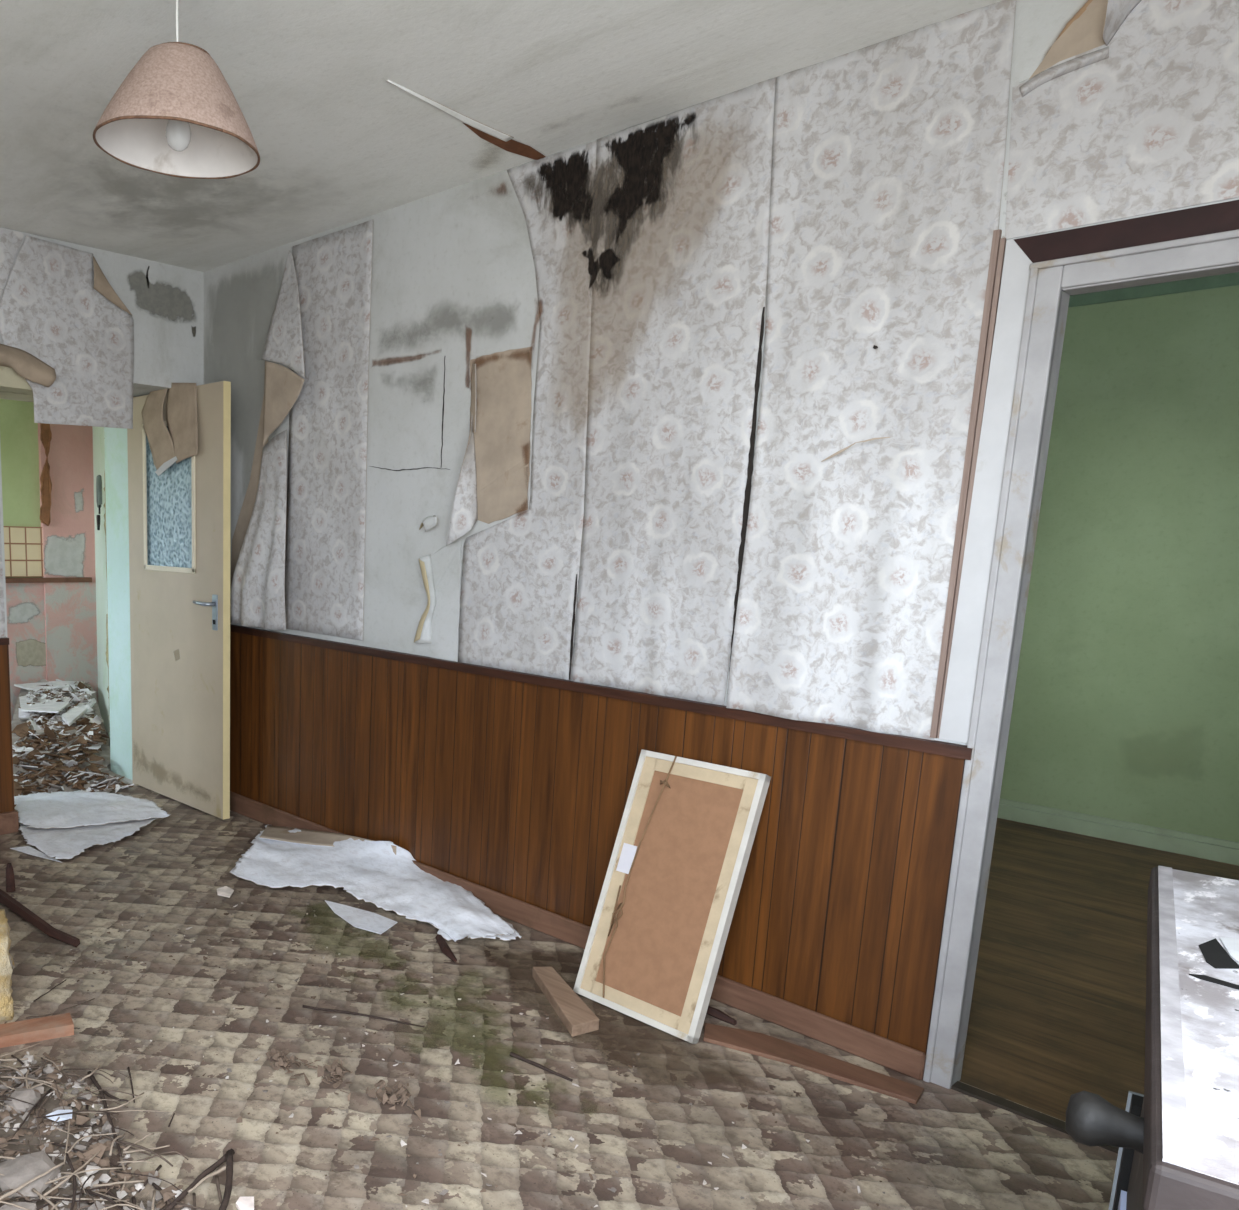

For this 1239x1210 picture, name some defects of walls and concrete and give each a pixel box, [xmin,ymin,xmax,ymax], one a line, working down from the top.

water stain [525,113,696,294]
spalling [128,271,196,337]
flaking render [414,540,462,662]